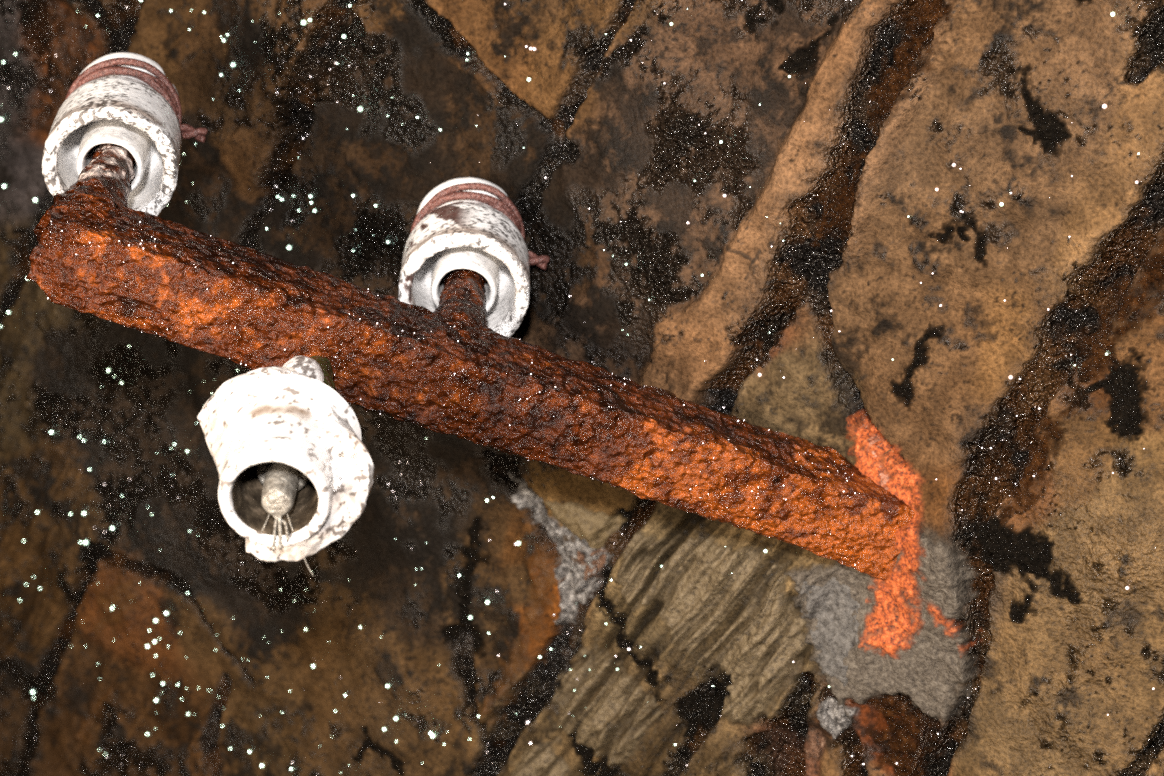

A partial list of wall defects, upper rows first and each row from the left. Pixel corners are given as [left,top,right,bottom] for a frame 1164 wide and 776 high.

damp [743,0,785,34]
damp [778,8,845,75]
corrosion [867,0,950,132]
damp [1014,65,1071,155]
corrosion [813,155,865,245]
damp [928,214,987,266]
corrosion [848,416,956,656]
corrosion [96,579,139,635]
crack [441,517,490,657]
crack [597,572,663,704]
crack [352,727,404,776]
damp [803,698,857,760]